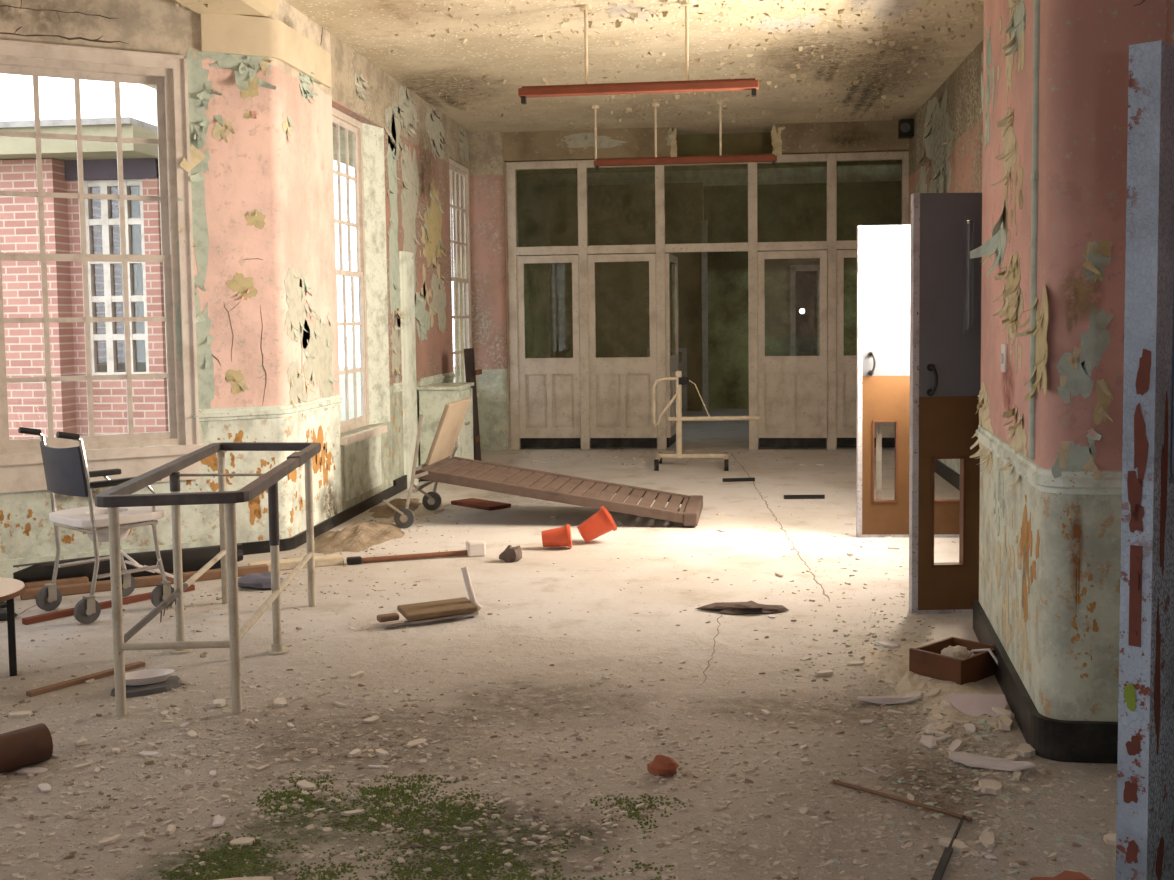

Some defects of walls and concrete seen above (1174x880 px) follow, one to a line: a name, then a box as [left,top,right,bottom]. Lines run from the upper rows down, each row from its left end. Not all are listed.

peeling [282,116,294,144]
peeling [299,71,322,104]
peeling [174,49,276,491]
peeling [284,264,339,411]
peeling [385,75,548,383]
peeling [412,0,1114,679]
peeling [248,489,268,541]
crack [731,453,830,601]
corrosion [1072,519,1081,603]
peeling [1127,349,1168,576]
crack [702,613,722,684]